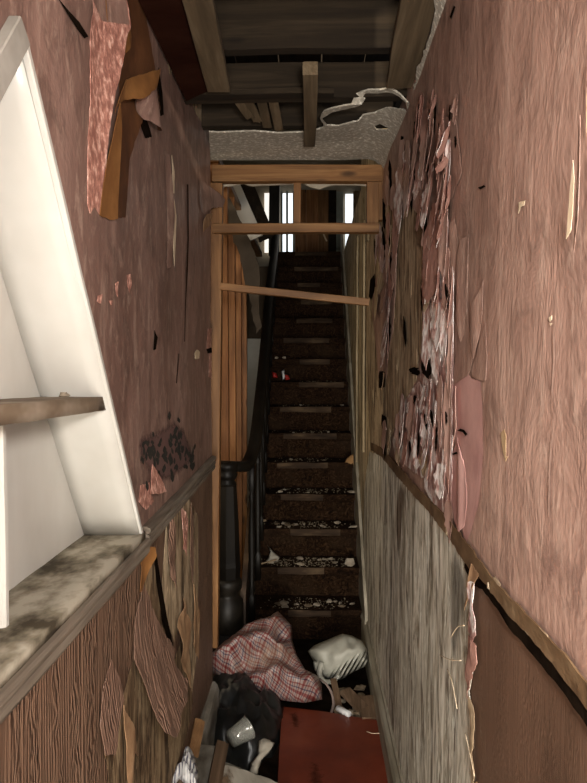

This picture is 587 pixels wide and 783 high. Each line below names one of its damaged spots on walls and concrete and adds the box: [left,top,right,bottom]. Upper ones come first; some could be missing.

leakage [140,412,196,482]
spalling [364,88,487,783]
peeling [140,546,157,592]